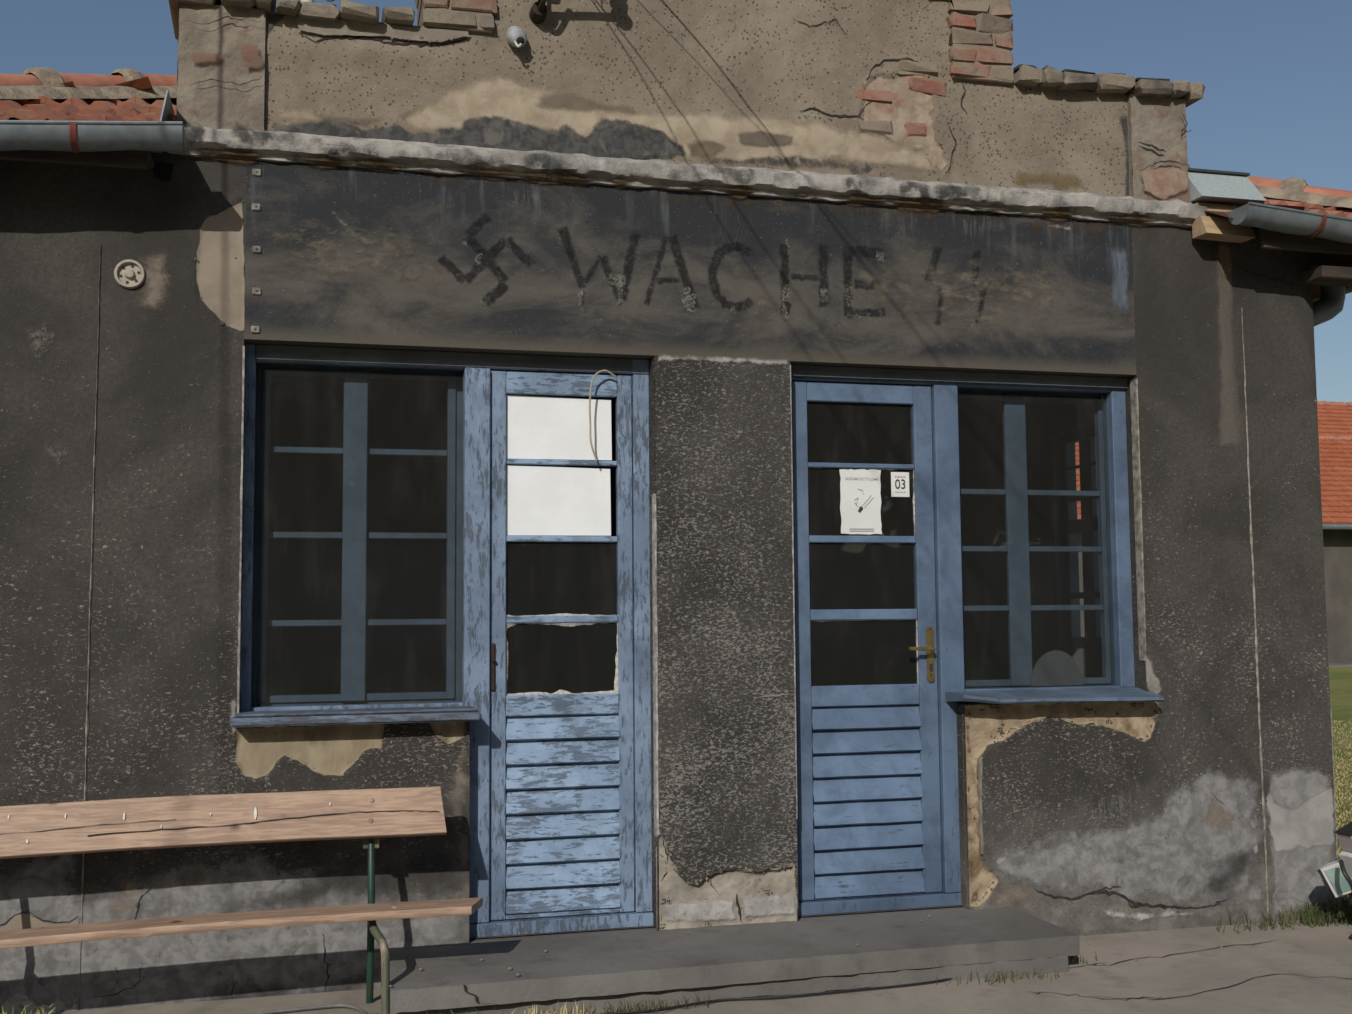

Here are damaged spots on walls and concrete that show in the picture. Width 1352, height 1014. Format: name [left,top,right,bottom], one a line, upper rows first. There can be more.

crack [299,32,468,47]
crack [802,58,928,120]
spalling [855,60,947,173]
crack [948,82,967,171]
spalling [194,199,385,780]
spalling [962,379,1161,910]
spalling [428,721,465,744]
damp [995,769,1335,921]
crack [1035,886,1228,913]